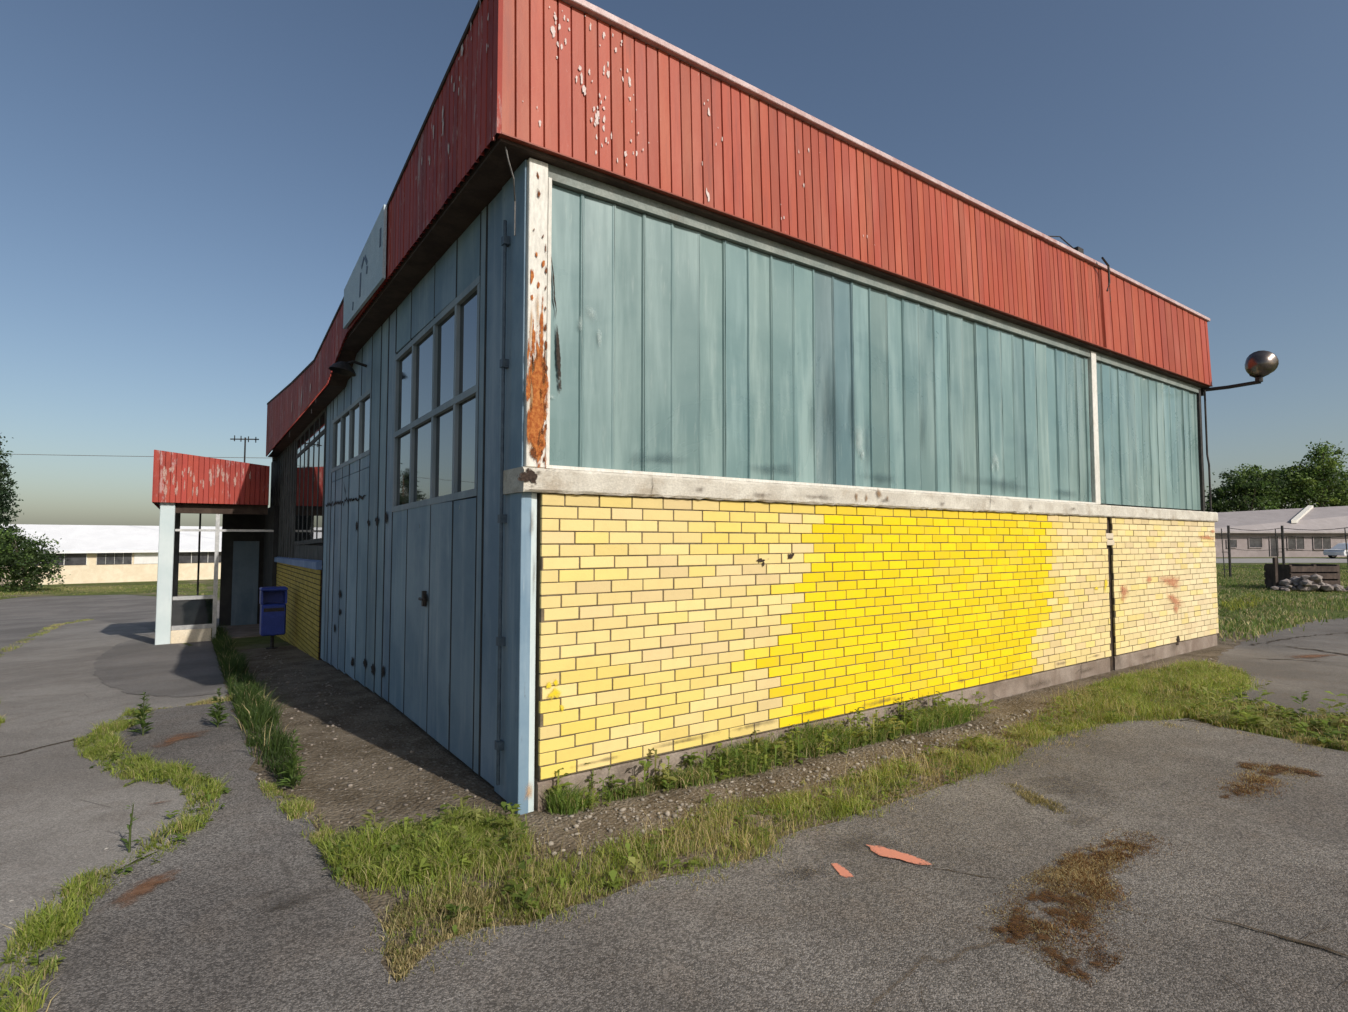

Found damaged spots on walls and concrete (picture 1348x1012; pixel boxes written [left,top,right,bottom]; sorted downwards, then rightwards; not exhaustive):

peeling [549,6,570,59]
peeling [575,15,637,154]
rust [526,228,549,469]
crack [1109,904,1348,988]